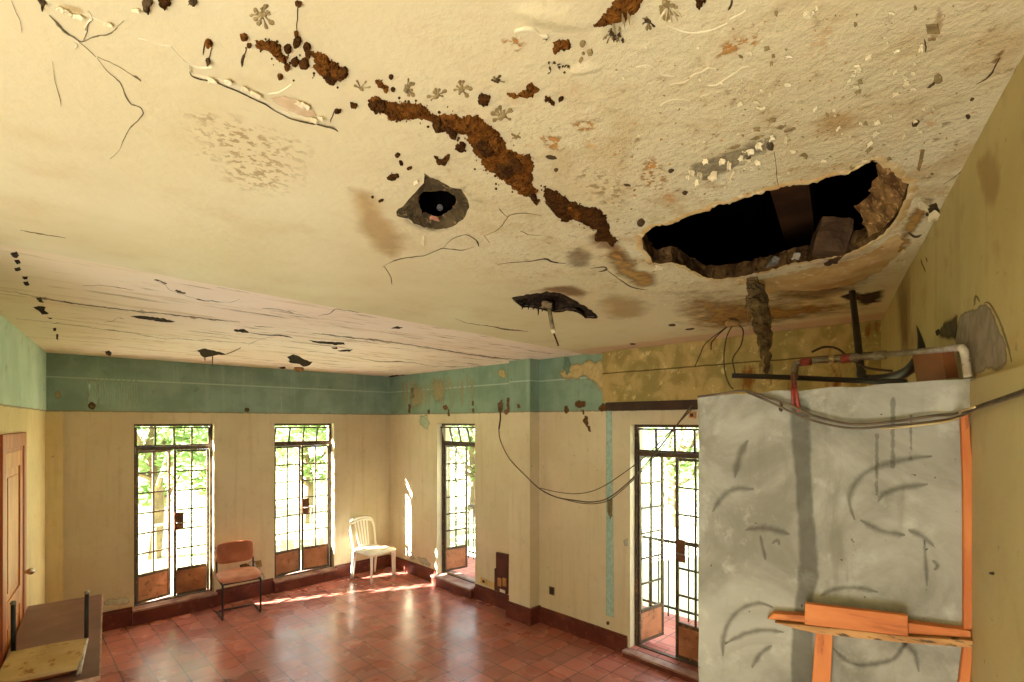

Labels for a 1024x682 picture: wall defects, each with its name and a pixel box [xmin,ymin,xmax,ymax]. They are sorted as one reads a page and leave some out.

corrosion [593,0,643,44]
crack [49,15,144,159]
corrosion [245,31,348,89]
corrosion [350,74,625,257]
peeling [682,125,796,195]
spalling [854,163,907,238]
crack [383,208,646,290]
crack [2,279,292,345]
crack [308,309,522,367]
damp [668,300,752,330]
damp [769,291,882,322]
peeling [560,357,602,390]